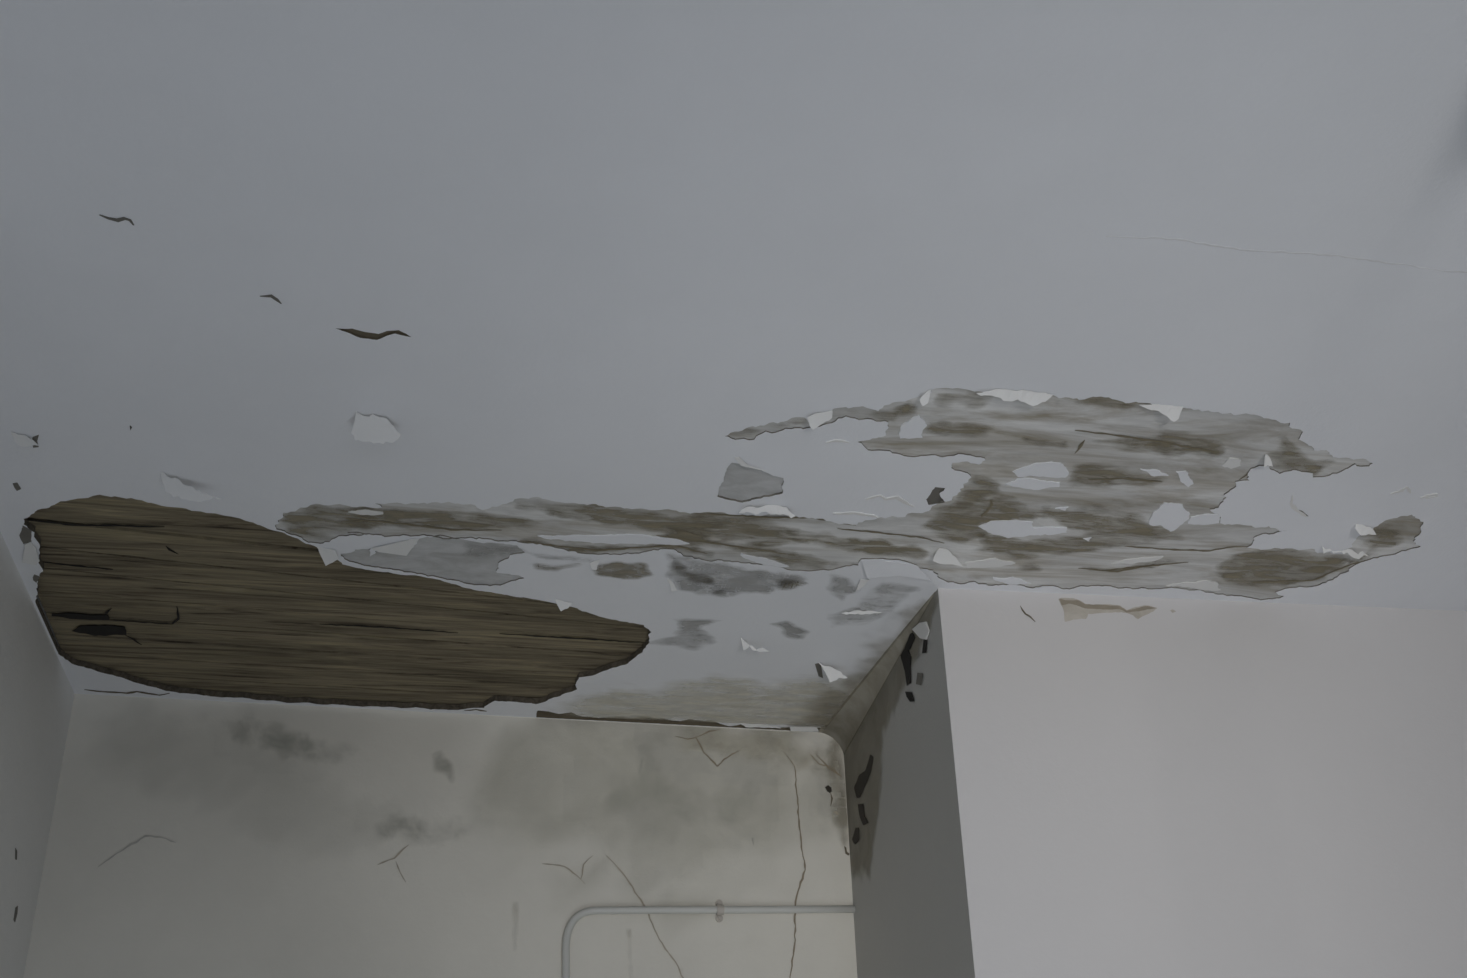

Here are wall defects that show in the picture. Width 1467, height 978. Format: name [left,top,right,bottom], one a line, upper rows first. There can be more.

peeling [19,388,1423,710]
water stain [674,558,789,594]
water stain [781,623,804,638]
crack [536,711,873,978]